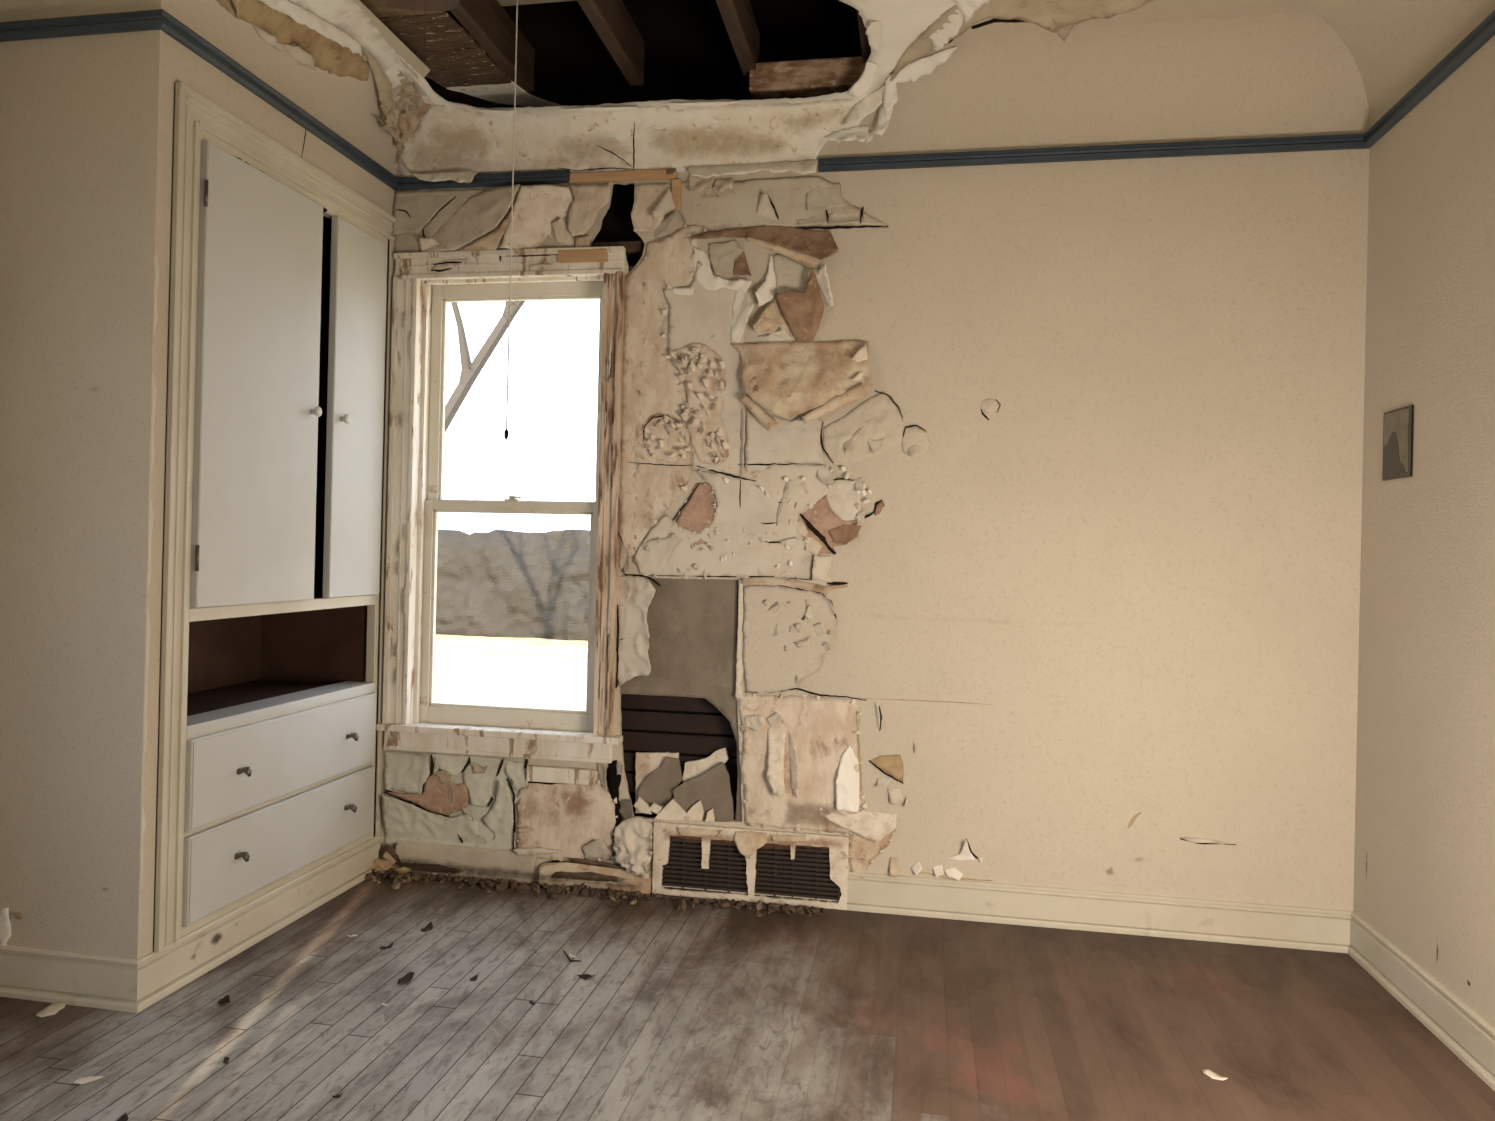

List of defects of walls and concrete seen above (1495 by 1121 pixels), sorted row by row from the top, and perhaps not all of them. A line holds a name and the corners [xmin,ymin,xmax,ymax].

damp [400,94,864,176]
flaking render [216,0,993,881]
peeling [142,369,157,764]
peeling [139,803,147,890]
peeling [0,908,24,946]